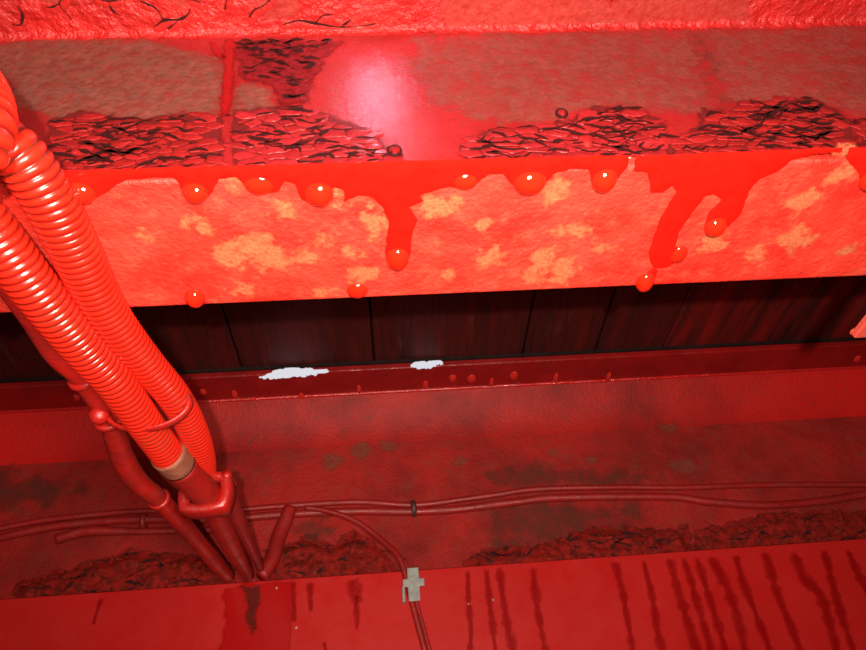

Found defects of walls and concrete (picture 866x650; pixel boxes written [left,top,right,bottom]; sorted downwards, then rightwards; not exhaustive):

crack [12,0,27,32]
crack [45,0,79,31]
crack [94,0,380,32]
peeling [0,37,405,171]
water stain [65,147,866,281]
peeling [521,223,618,286]
peeling [457,95,866,269]
water stain [219,582,296,650]
water stain [486,570,515,650]
water stain [668,559,747,650]
water stain [735,557,771,650]
water stain [794,552,855,650]